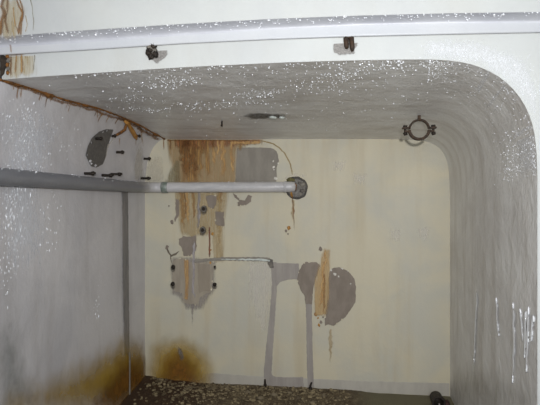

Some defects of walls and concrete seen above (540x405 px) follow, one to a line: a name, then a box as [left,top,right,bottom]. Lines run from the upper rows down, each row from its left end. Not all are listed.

rust [0,0,26,35]
peeling [86,129,113,167]
rust [163,139,262,182]
peeling [235,147,279,182]
rust [177,192,224,264]
spalling [172,227,213,319]
spalling [297,261,320,304]
rust [314,246,329,327]
spalling [324,267,356,327]
leakage [48,351,145,403]
leakage [154,347,206,382]
leakage [512,303,535,384]